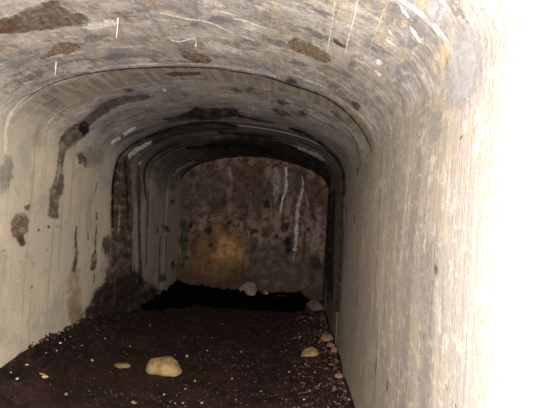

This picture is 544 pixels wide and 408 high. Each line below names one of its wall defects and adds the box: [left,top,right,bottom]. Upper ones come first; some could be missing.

spalling [40,42,80,59]
spalling [180,52,211,63]
spalling [288,37,331,63]
water stain [165,107,239,121]
water stain [49,89,150,219]
water stain [258,167,288,214]
water stain [81,141,166,323]
water stain [249,178,344,312]